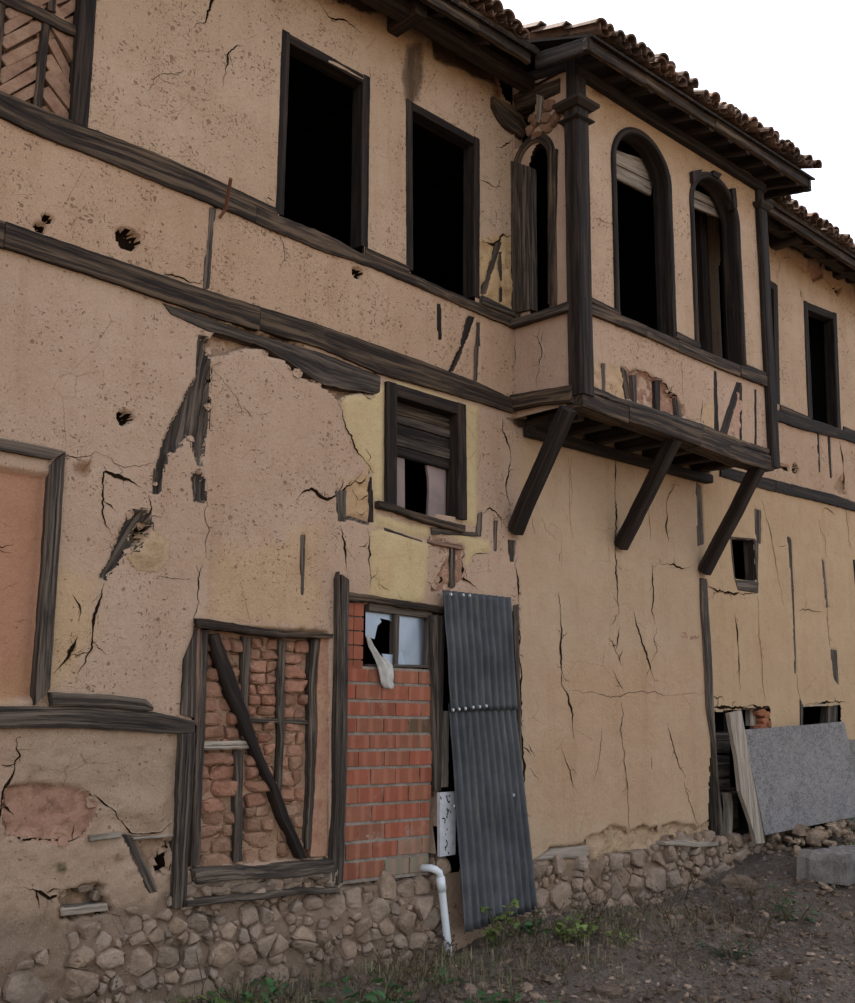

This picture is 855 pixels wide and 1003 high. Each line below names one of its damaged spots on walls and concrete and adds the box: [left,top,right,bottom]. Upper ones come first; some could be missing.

crack [195,0,216,27]
crack [316,0,362,34]
spalling [151,334,274,503]
spalling [287,365,375,400]
crack [483,417,512,525]
spalling [620,366,683,415]
crack [54,451,161,674]
crack [429,552,488,590]
crack [514,557,535,782]
crack [557,441,851,835]
crack [0,738,85,844]